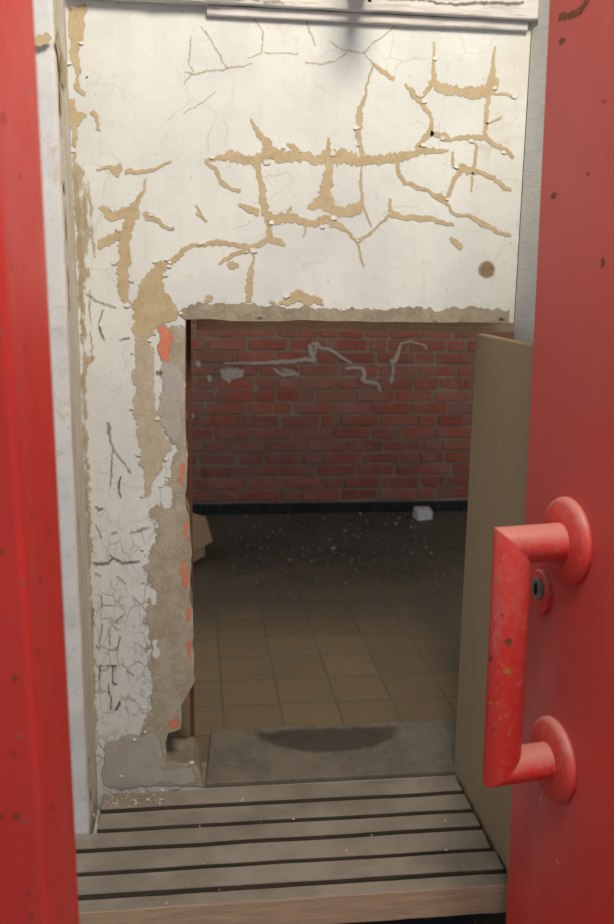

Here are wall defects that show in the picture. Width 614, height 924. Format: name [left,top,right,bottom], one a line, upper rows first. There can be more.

peeling [96,160,172,177]
peeling [238,203,260,216]
peeling [35,4,100,742]
damp [196,340,427,392]
crack [90,422,149,711]
spalling [124,257,509,790]